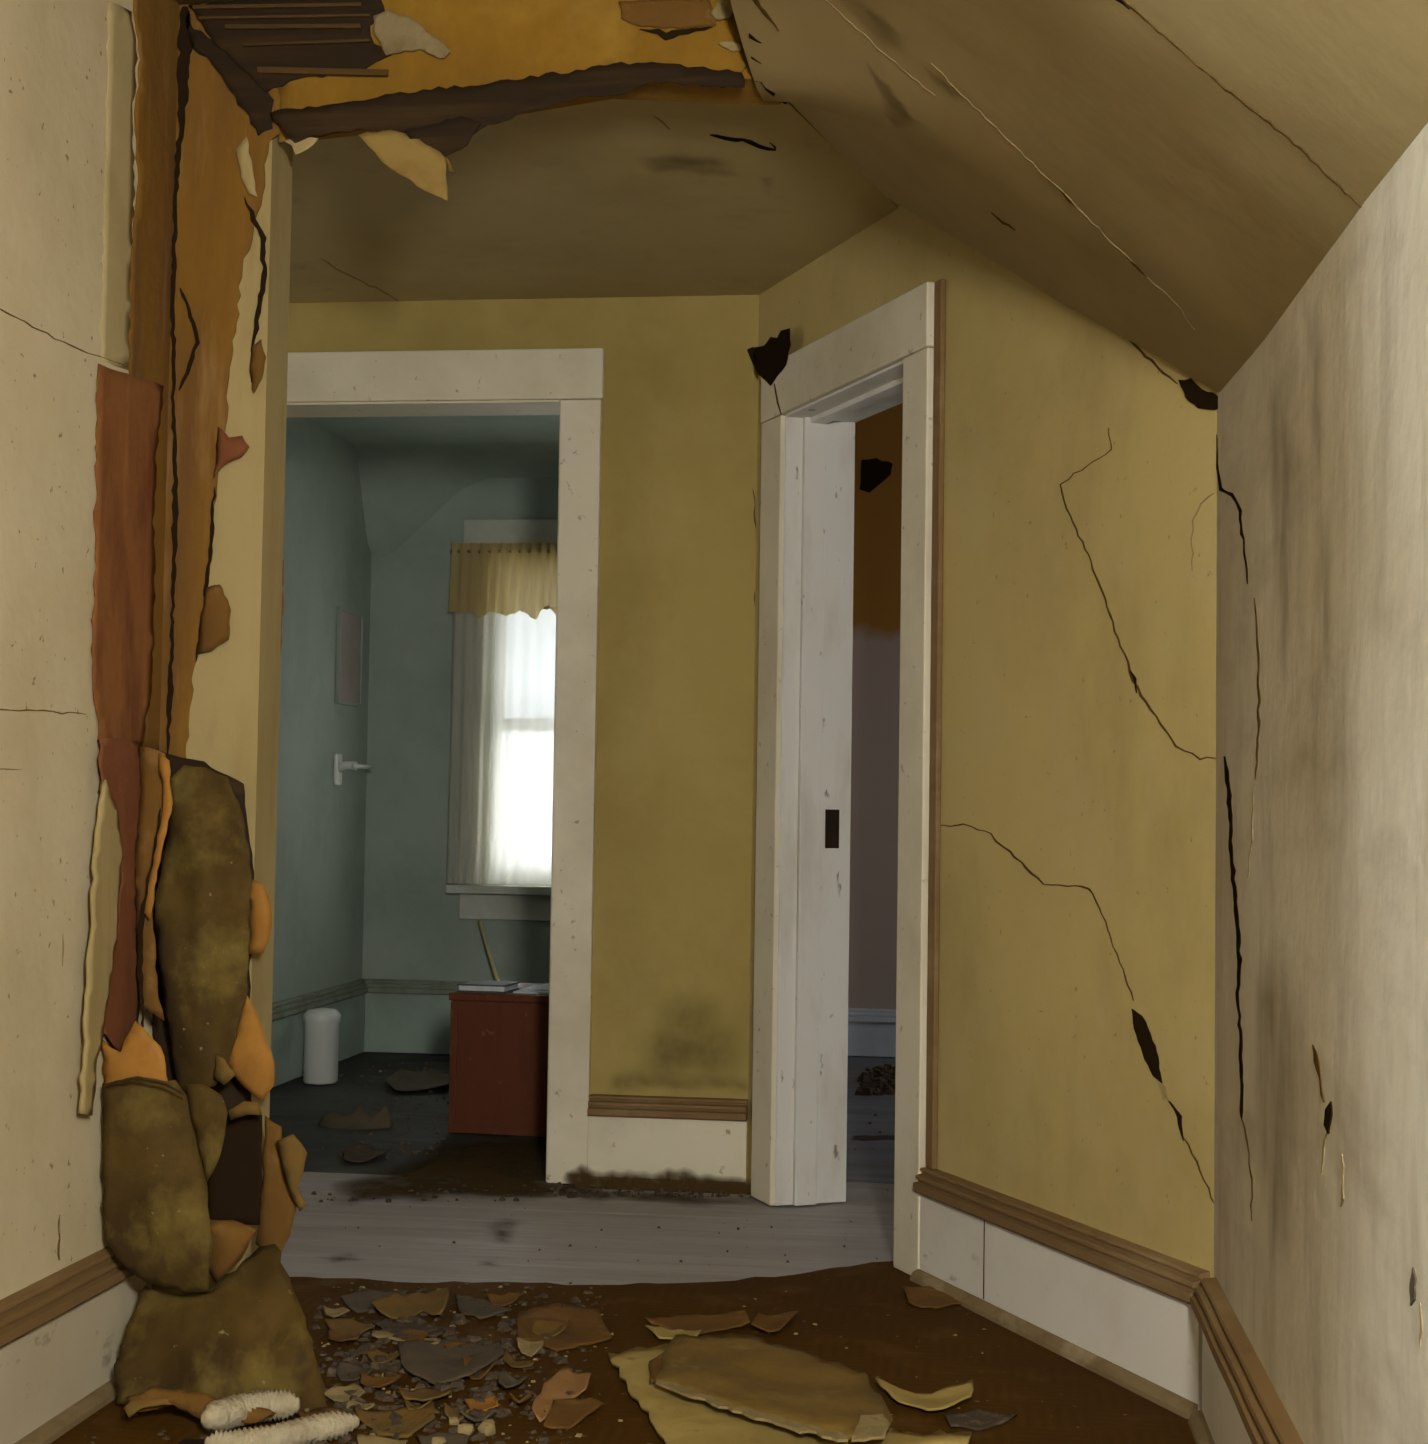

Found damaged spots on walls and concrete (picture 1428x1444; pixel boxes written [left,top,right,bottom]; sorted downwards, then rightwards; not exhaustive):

spalling [185,0,391,196]
crack [1116,0,1361,208]
crack [824,0,1195,330]
crack [0,308,129,368]
peeling [250,339,266,393]
peeling [214,427,249,477]
peeling [197,585,231,654]
crack [0,708,87,716]
crack [1060,428,1261,1221]
crack [941,823,1134,1001]
hole [206,1114,263,1225]
peeling [1409,1267,1417,1306]